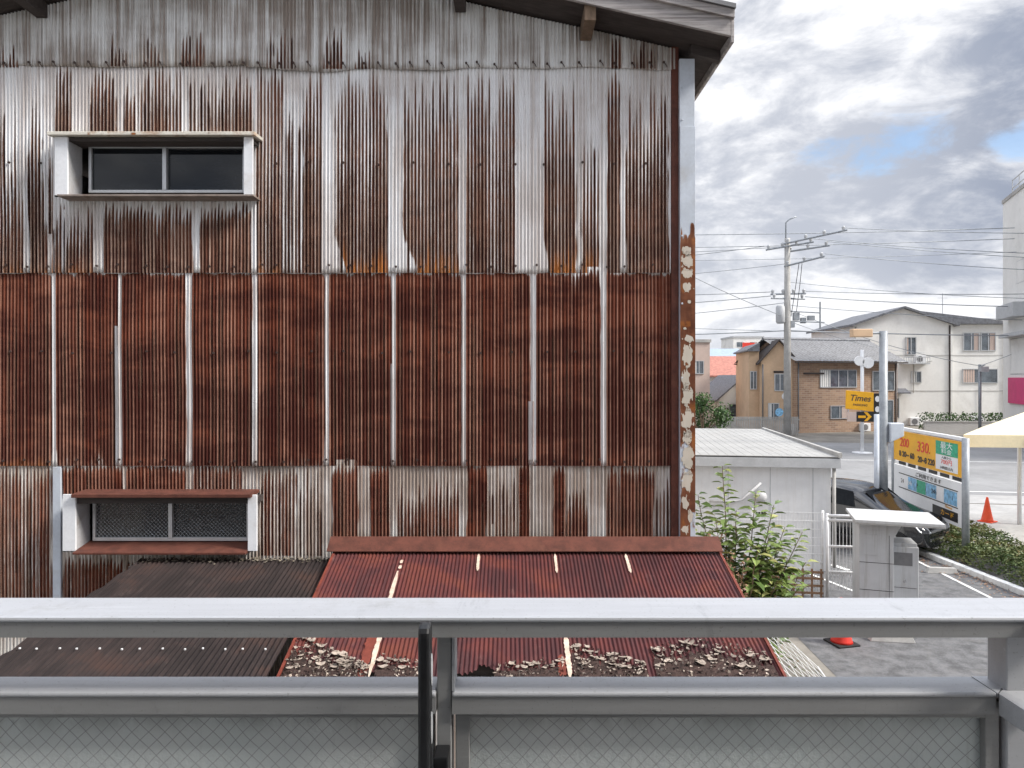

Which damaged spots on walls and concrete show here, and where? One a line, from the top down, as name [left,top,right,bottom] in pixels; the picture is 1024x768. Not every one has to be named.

corrosion [0,31,695,598]